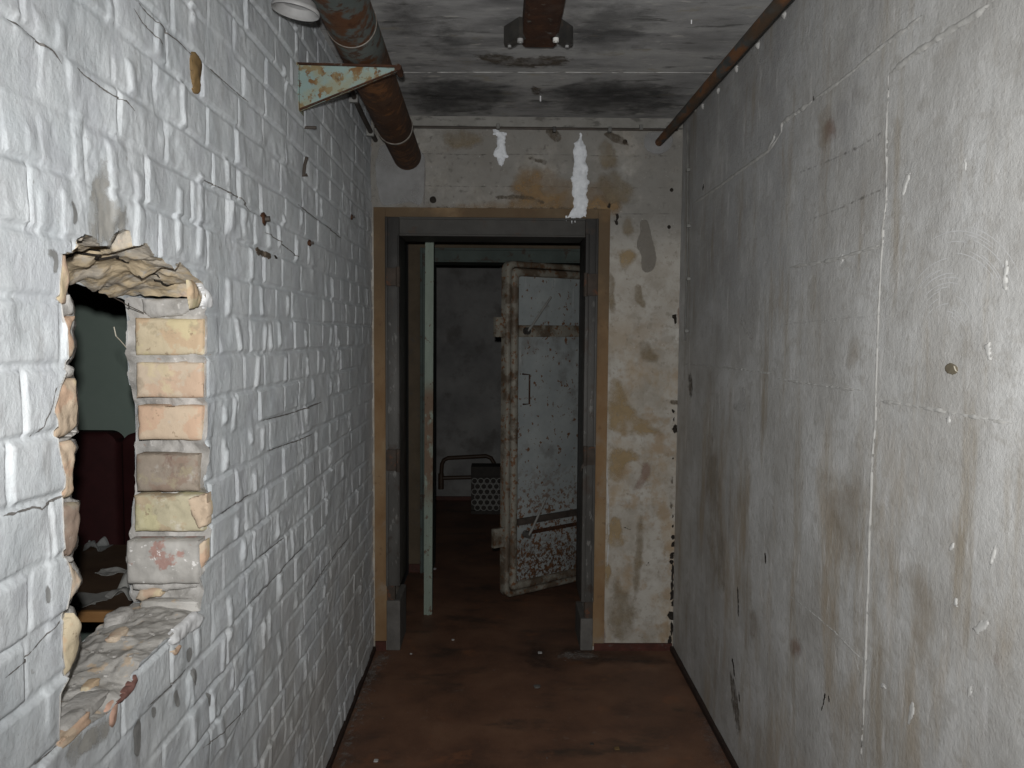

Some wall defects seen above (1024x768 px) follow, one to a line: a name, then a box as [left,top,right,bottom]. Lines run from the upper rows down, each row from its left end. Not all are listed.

crack [7,19,135,111]
damp [493,129,509,166]
damp [565,133,597,223]
damp [620,220,656,272]
spalling [49,173,213,757]